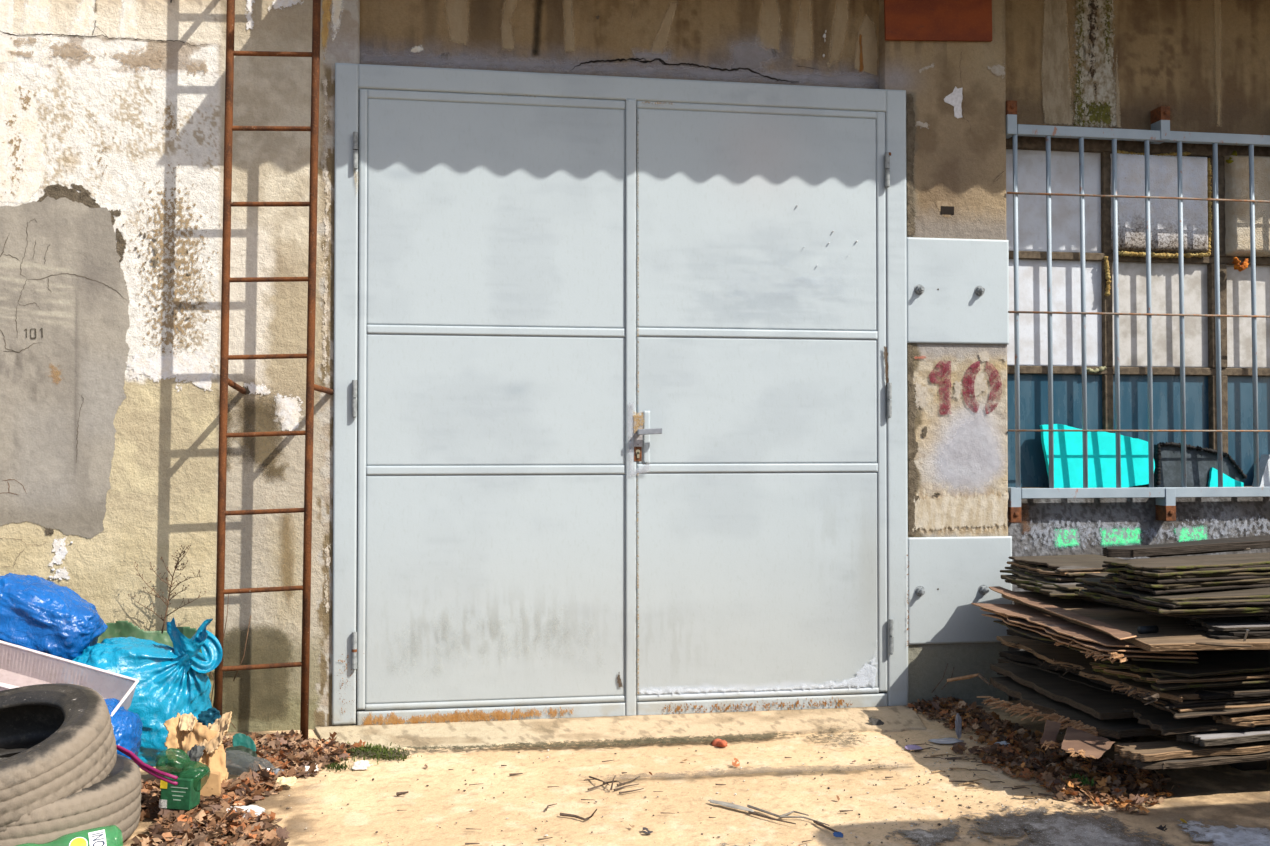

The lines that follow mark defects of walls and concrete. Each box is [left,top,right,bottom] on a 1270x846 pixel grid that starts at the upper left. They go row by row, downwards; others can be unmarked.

water stain [0,0,97,66]
water stain [116,0,138,39]
crack [572,58,815,83]
water stain [1042,0,1121,127]
peeling [944,86,963,118]
water stain [0,82,45,205]
peeling [953,351,1008,400]
peeling [907,345,930,535]
rust [363,707,574,725]
rust [662,697,853,715]